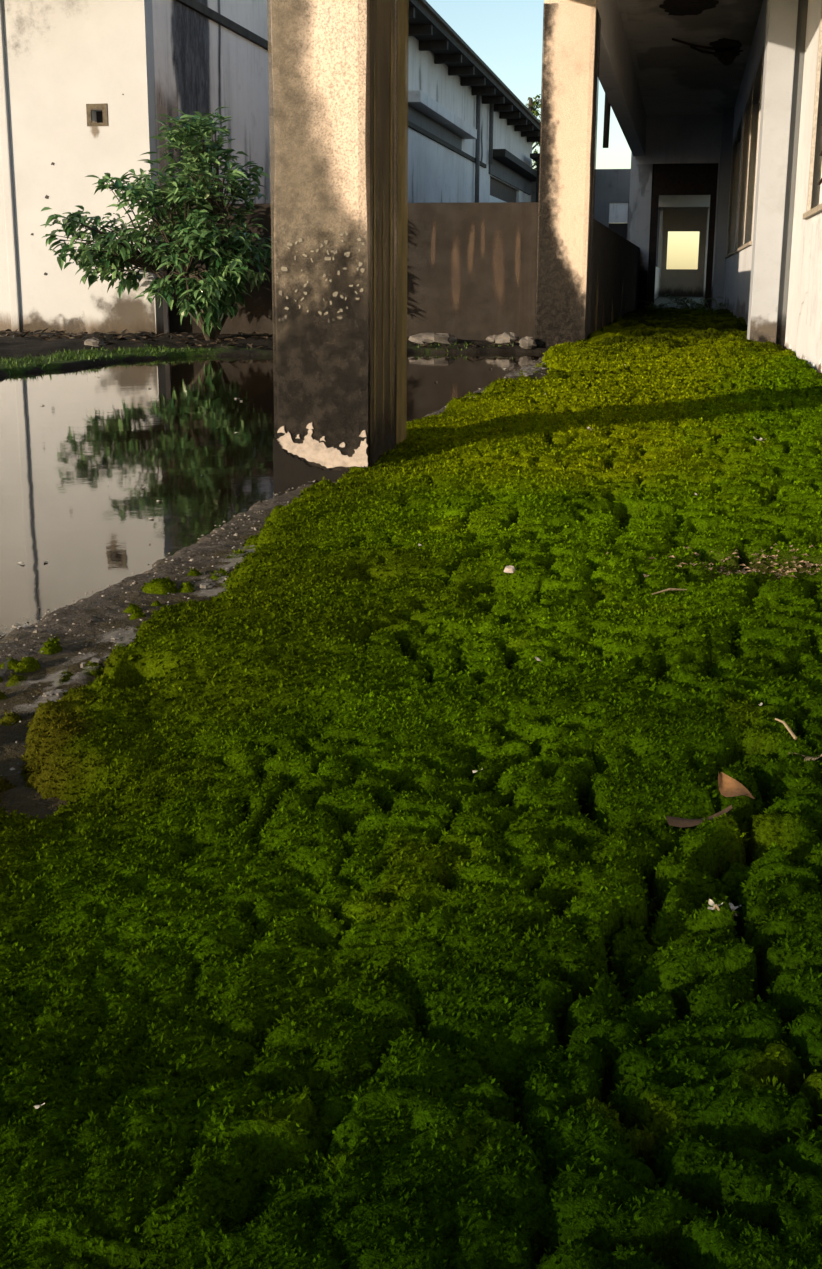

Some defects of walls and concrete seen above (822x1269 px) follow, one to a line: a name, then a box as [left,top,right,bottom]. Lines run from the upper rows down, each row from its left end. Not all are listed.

damp [267,0,395,497]
damp [451,221,520,305]
damp [535,3,586,348]
flaking render [277,422,368,468]